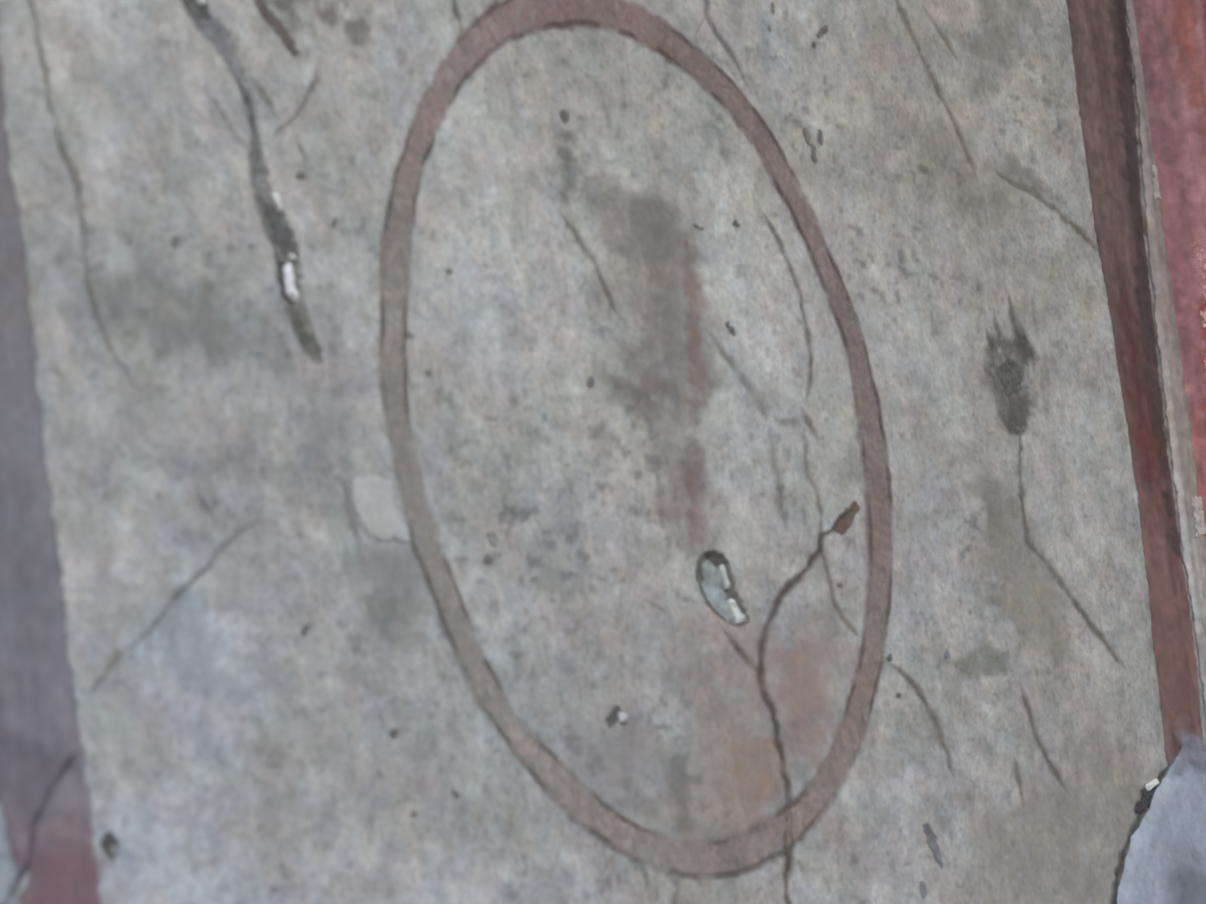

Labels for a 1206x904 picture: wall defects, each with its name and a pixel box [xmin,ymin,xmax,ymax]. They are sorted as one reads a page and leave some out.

crack [148,558,214,631]
spalling [696,549,750,627]
crack [1019,445,1117,658]
crack [732,511,849,904]
crack [3,756,74,904]